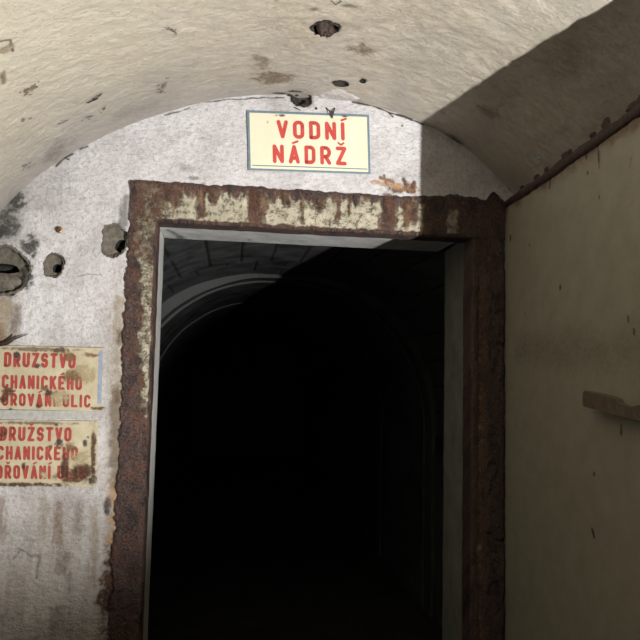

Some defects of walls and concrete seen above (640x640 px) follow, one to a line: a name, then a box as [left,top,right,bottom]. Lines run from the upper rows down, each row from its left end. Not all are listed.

flaking render [310,20,340,38]
flaking render [287,94,318,110]
rust [503,95,640,207]
rust [372,174,418,218]
water stain [0,193,24,238]
water stain [21,234,39,258]
flaking render [101,223,127,258]
flaking render [0,244,32,296]
flaking render [43,252,64,277]